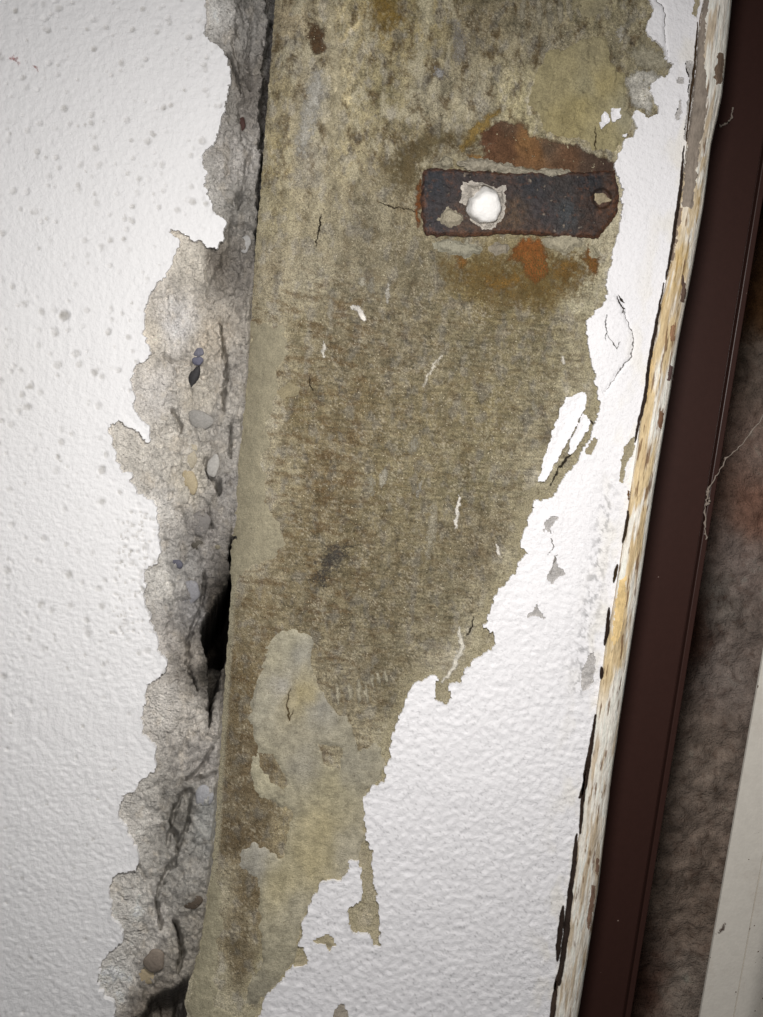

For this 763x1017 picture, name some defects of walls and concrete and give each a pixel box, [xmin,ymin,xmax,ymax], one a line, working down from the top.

crack [227,0,275,243]
leakage [297,0,342,155]
leakage [417,0,434,24]
corrosion [459,110,614,173]
leakage [626,45,667,115]
peeling [670,0,725,263]
corrosion [441,238,599,309]
crack [203,324,233,529]
crack [184,575,206,691]
leakage [310,543,356,593]
peeling [98,0,672,1017]
crack [155,748,217,974]